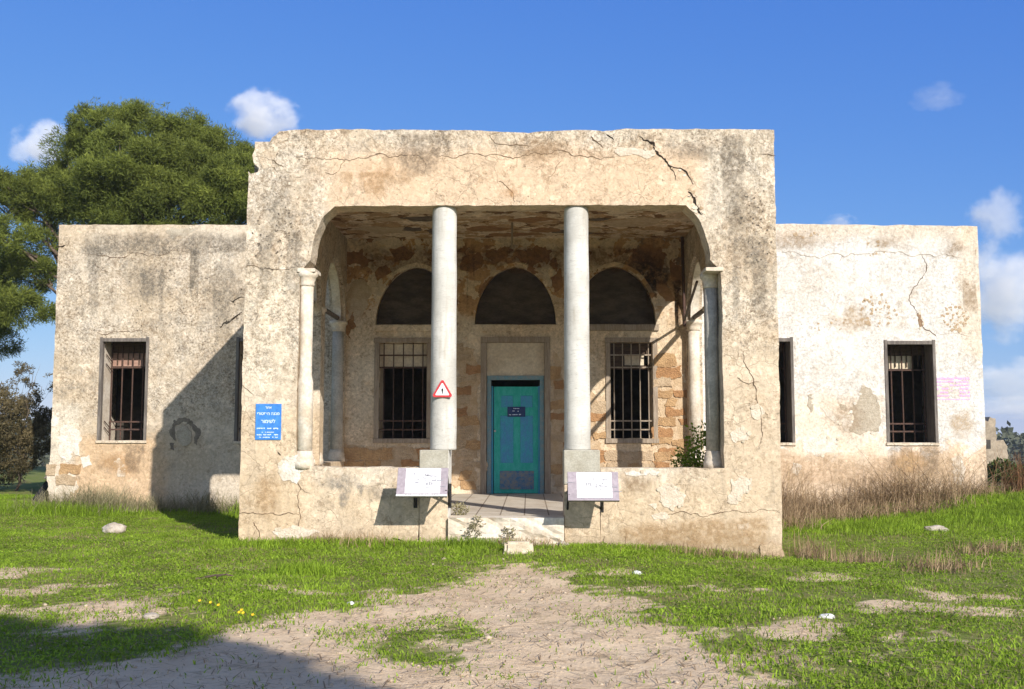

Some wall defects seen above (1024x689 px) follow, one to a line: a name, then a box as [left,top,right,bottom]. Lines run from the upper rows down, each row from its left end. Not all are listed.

crack [256,133,614,200]
crack [641,137,706,215]
peeling [347,246,415,281]
peeling [400,216,432,234]
peeling [460,217,564,292]
crack [781,251,966,336]
peeling [45,416,92,499]
peeling [278,454,306,484]
peeling [550,351,564,487]
peeling [590,351,688,520]
crack [737,354,766,446]
peeling [791,385,881,476]